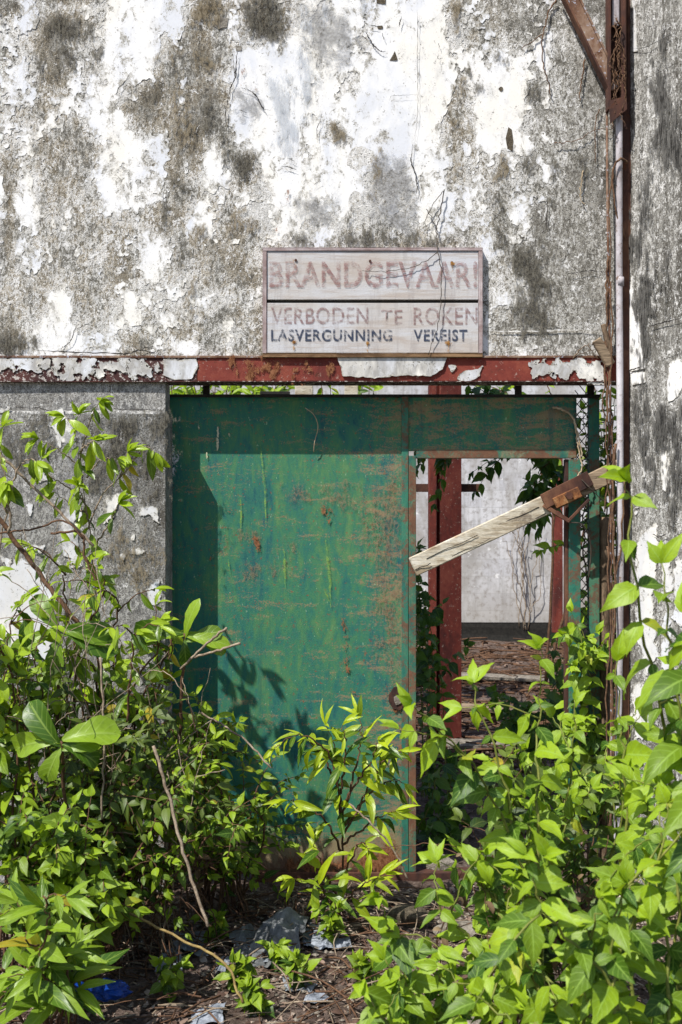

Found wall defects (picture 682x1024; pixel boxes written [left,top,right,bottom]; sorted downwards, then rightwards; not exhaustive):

water stain [32,10,103,90]
water stain [151,0,290,196]
water stain [160,174,190,230]
peeling [0,0,559,383]
water stain [629,17,682,530]
corrosion [227,354,313,386]
peeling [515,344,604,385]
peeling [629,276,646,385]
peeling [667,358,682,402]
peeling [660,447,670,492]
peeling [630,523,682,740]